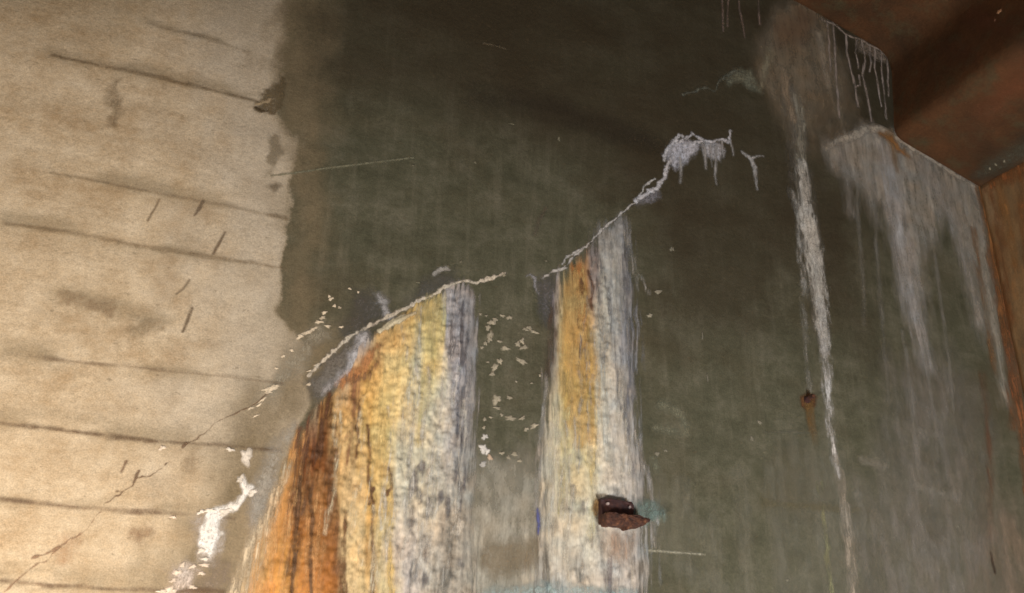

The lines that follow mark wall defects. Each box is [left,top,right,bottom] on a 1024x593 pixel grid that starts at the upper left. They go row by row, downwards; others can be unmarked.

damp [667,130,757,187]
damp [682,3,989,421]
peeling [248,295,343,417]
damp [977,295,1007,400]
crack [6,536,77,591]
damp [831,438,856,593]